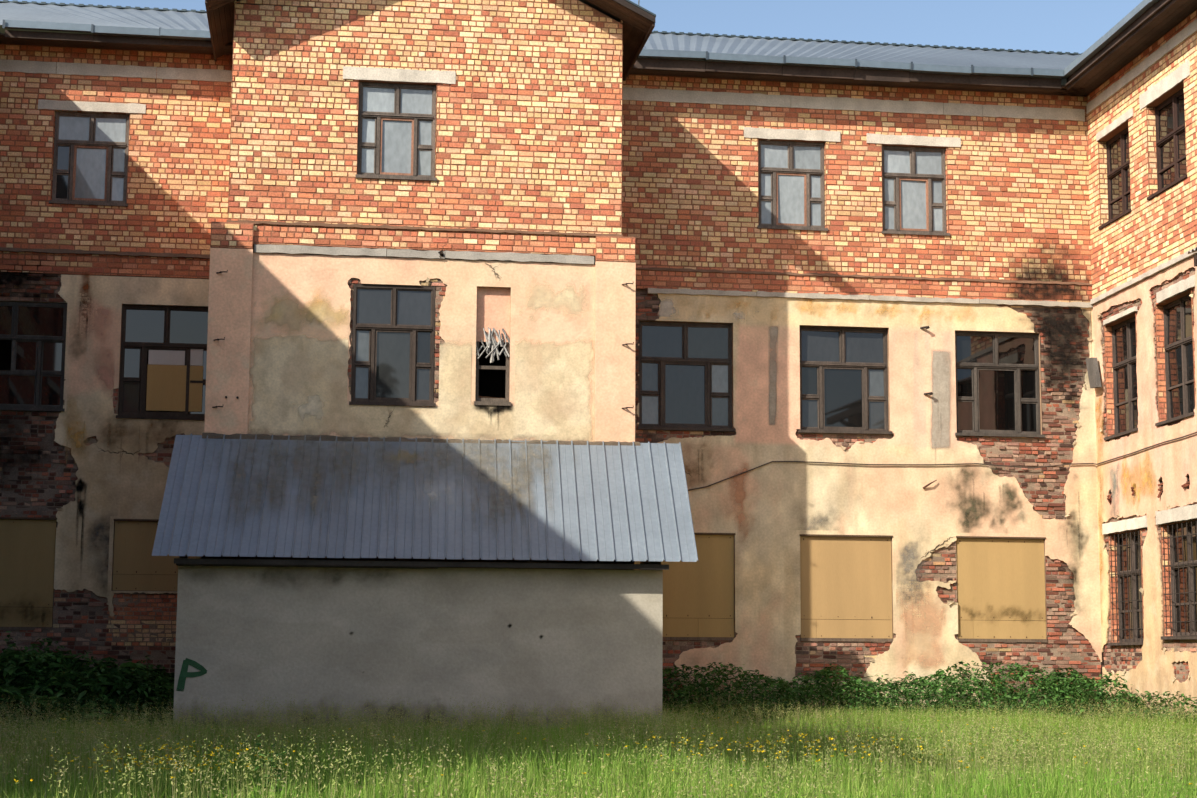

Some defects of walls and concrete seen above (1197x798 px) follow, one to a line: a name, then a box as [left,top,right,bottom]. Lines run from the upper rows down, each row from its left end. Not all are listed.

flaking render [0,274,66,303]
peeling [249,277,594,441]
flaking render [956,267,1196,521]
flaking render [0,404,101,528]
water stain [956,469,1019,529]
flaking render [0,589,177,675]
flaking render [663,632,737,705]
flaking render [795,633,896,683]
flaking render [954,556,1143,714]